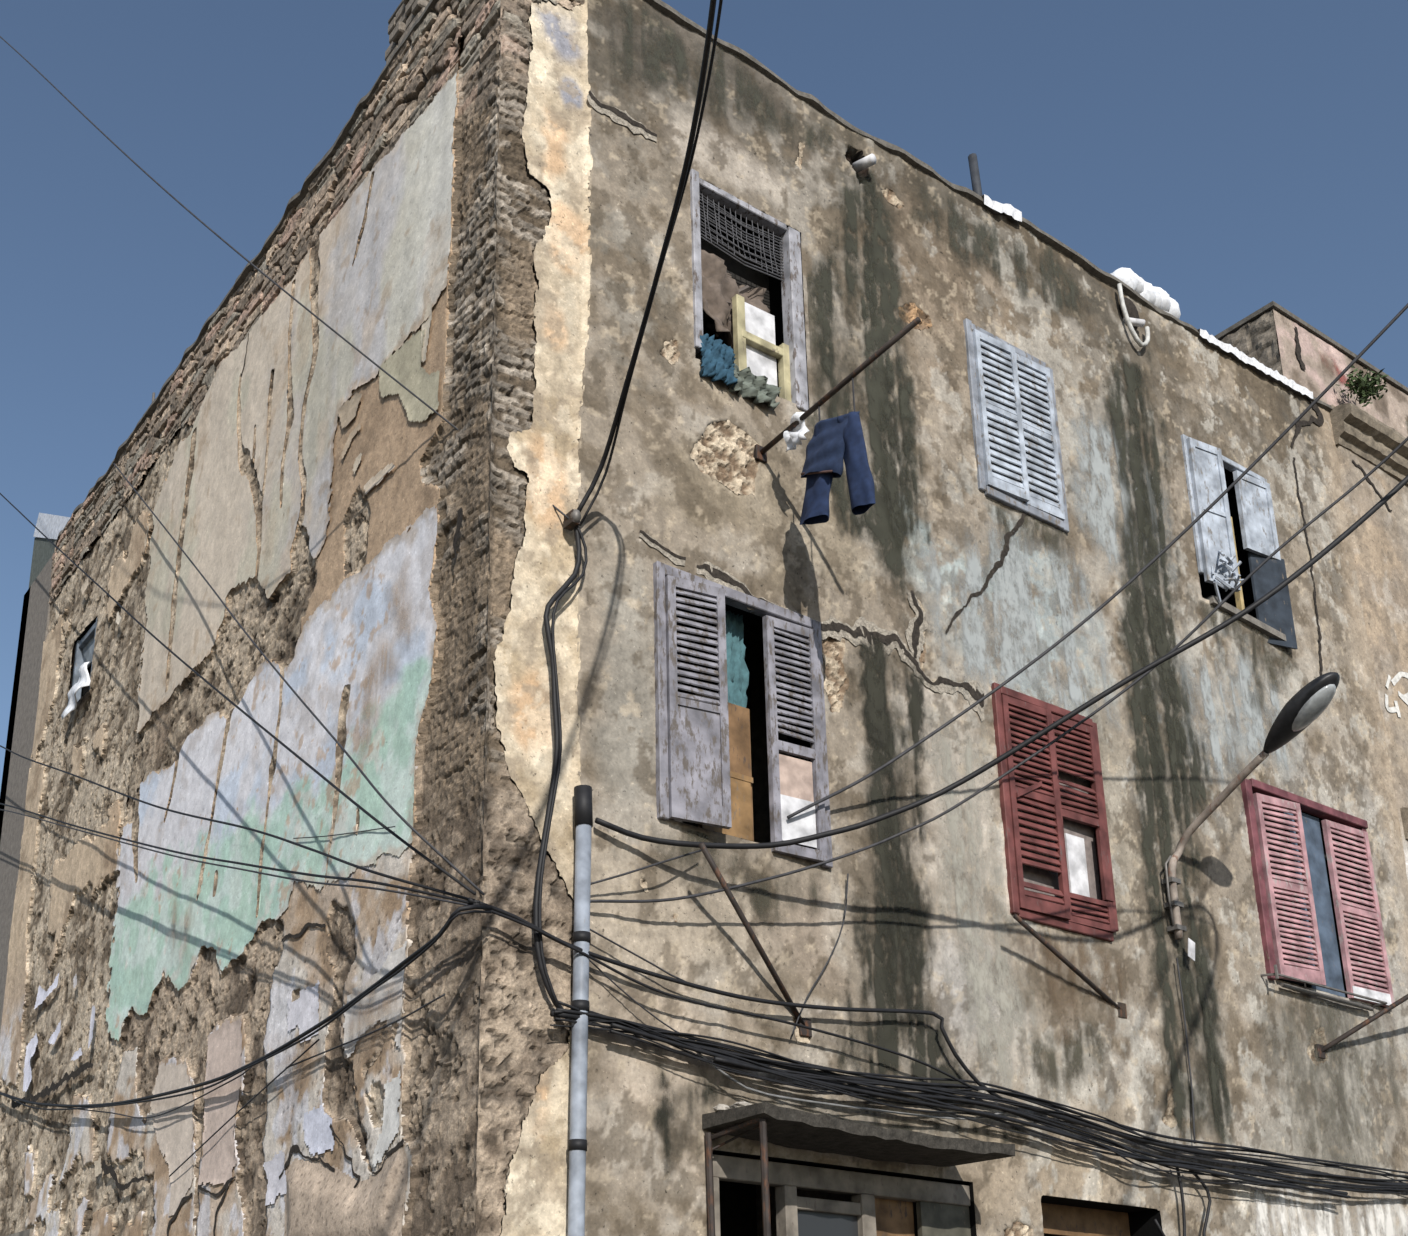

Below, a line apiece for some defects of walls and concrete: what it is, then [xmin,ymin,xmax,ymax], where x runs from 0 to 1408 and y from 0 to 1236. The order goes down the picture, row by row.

flaking render [689,420,761,496]
leakage [807,172,930,592]
flaking render [0,0,593,1236]
crack [639,512,1031,721]
leakage [1105,359,1231,1141]
leakage [751,878,778,918]
leakage [839,639,964,1102]
leakage [654,1071,672,1155]
leakage [696,1080,717,1103]
leakage [874,1114,1022,1143]